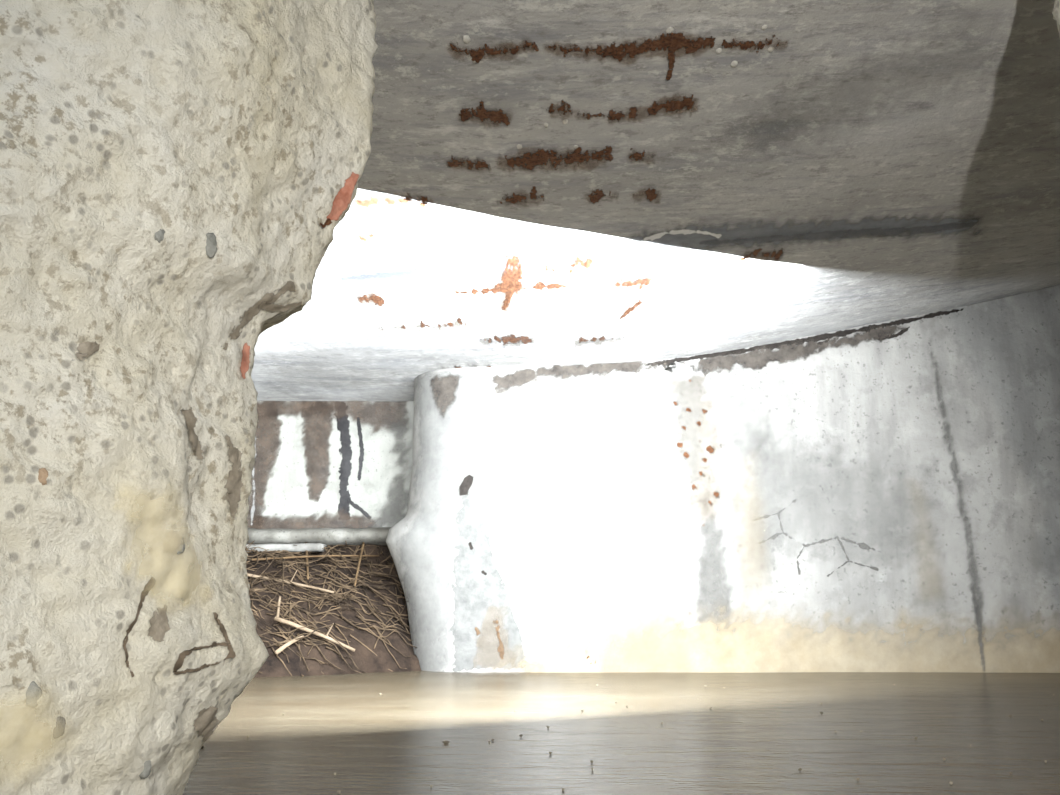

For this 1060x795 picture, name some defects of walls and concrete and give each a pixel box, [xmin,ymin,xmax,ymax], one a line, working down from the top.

corrosion [449,25,787,80]
corrosion [459,100,510,126]
corrosion [544,94,697,127]
corrosion [448,144,613,170]
corrosion [735,248,783,262]
corrosion [358,294,385,307]
corrosion [455,253,594,311]
corrosion [485,334,532,346]
corrosion [677,440,714,489]
water stain [247,372,470,672]
water stain [520,363,1060,673]
crack [753,499,879,577]